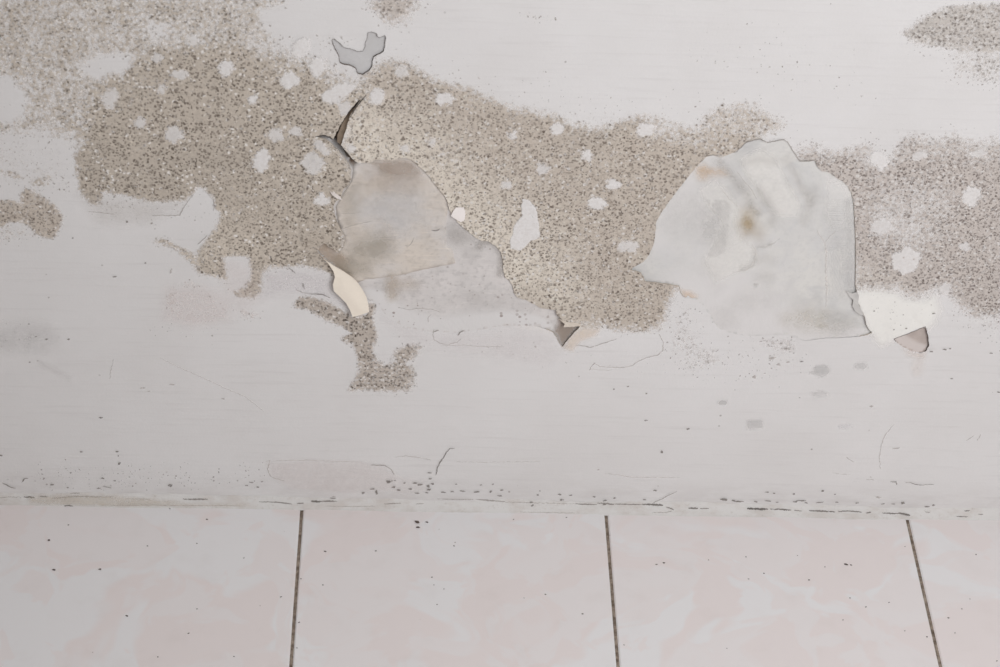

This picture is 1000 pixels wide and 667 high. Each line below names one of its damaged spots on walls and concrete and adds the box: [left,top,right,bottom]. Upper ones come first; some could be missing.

peeling [332,32,386,75]
peeling [317,99,597,349]
peeling [632,139,875,341]
peeling [893,327,951,353]